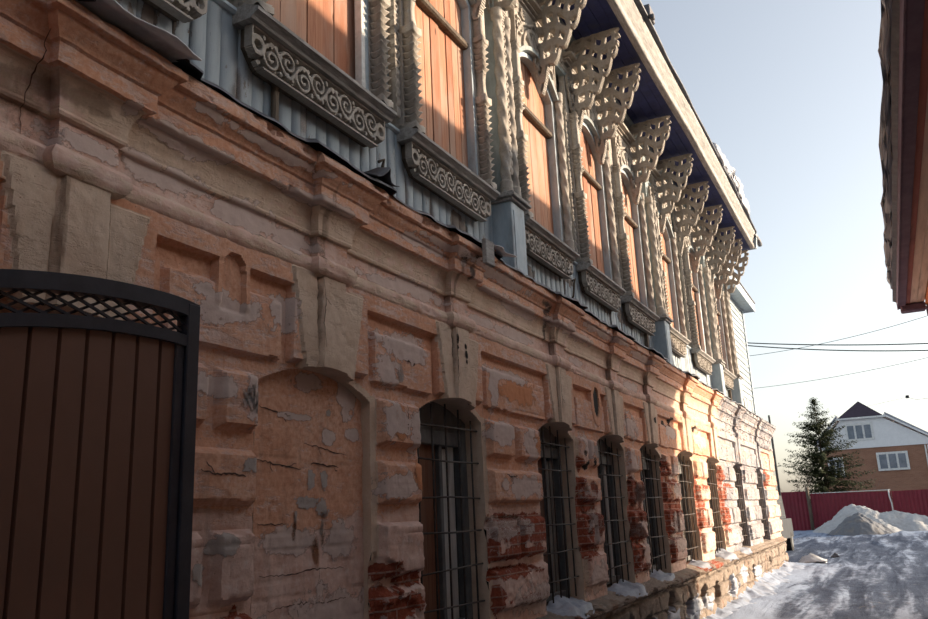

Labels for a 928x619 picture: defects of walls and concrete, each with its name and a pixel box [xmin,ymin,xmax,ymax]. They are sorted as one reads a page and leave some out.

crack [19,29,51,132]
peeling [15,100,324,255]
peeling [192,282,303,337]
crack [201,443,344,477]
spalling [288,559,426,619]
peeling [368,328,428,506]
peeling [482,363,542,501]
spalling [484,512,550,619]
spalling [574,431,609,598]
peeling [624,409,652,578]
spalling [659,458,724,572]
peeling [692,428,749,549]